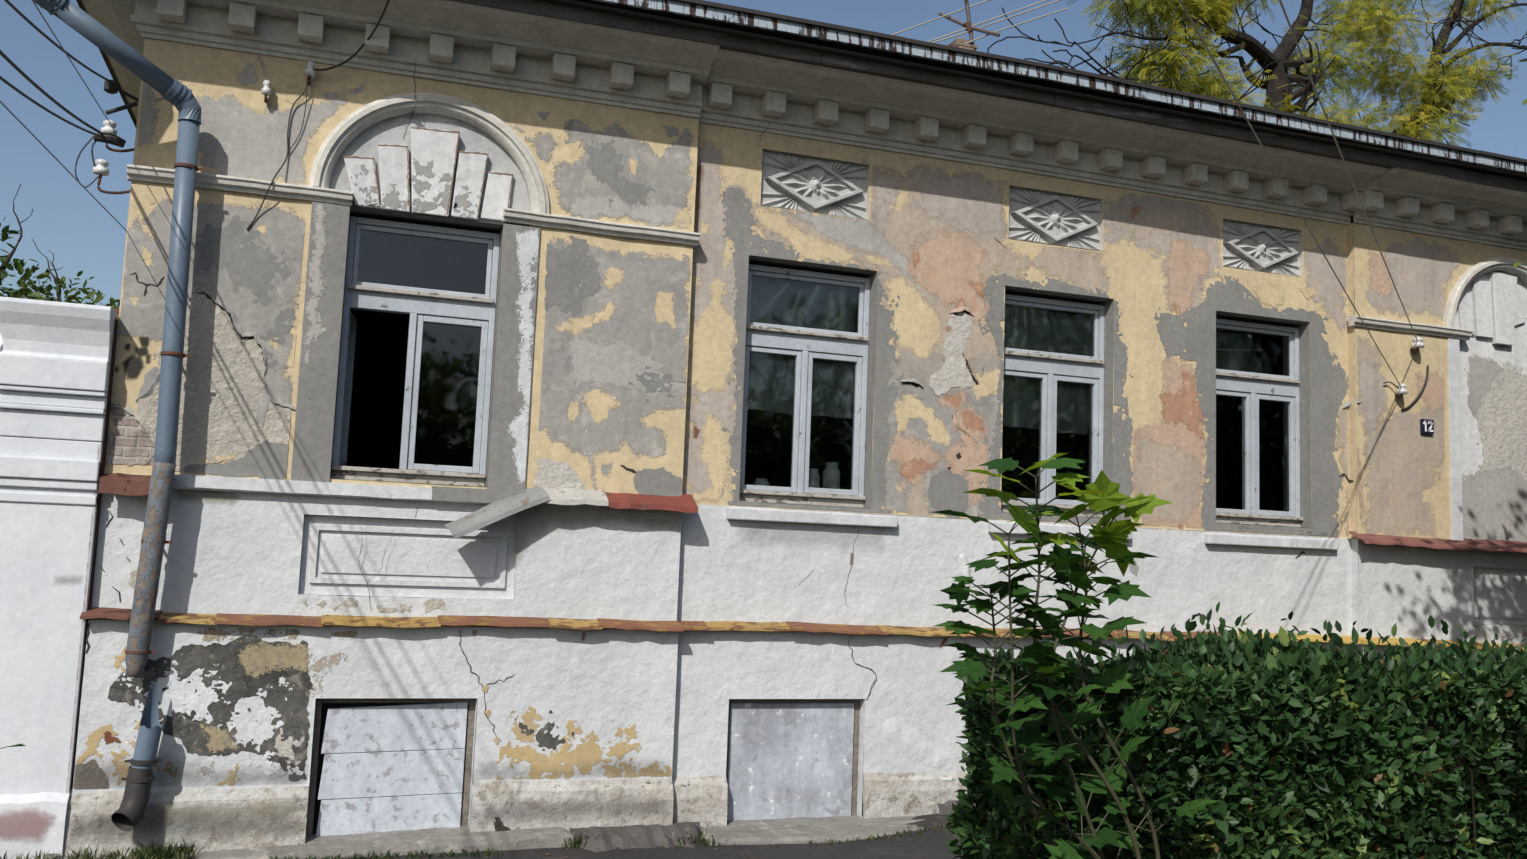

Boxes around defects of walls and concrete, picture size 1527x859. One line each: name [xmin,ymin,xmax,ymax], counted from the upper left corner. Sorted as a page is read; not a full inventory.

peeling [196,55,365,185]
peeling [105,197,172,466]
spalling [175,201,328,471]
peeling [507,111,1222,529]
peeling [1252,234,1461,538]
peeling [1462,353,1527,542]
crack [358,508,418,611]
peeling [73,719,141,789]
peeling [113,644,127,672]
peeling [197,761,240,786]
crack [459,630,515,741]
peeling [494,706,672,780]